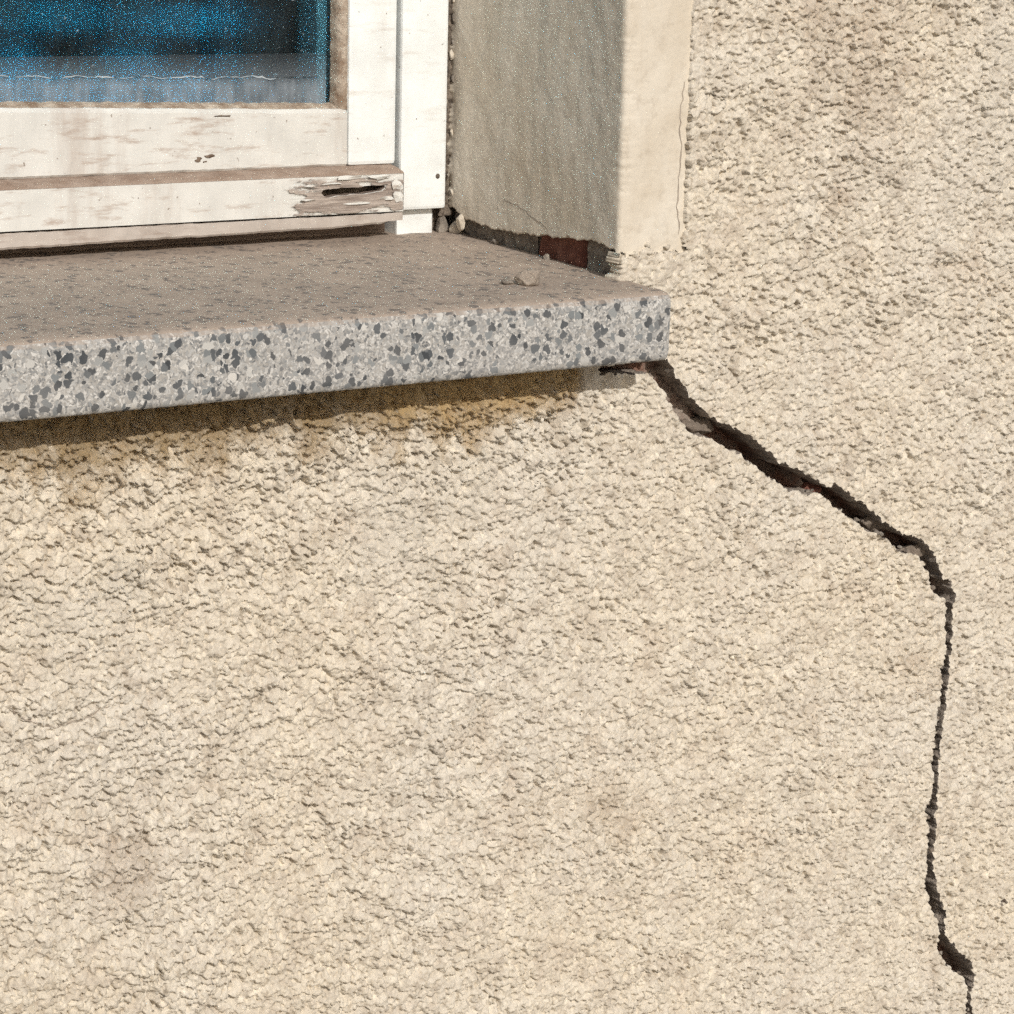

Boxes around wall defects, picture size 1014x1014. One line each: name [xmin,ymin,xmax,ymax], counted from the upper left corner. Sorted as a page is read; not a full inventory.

crack [598,359,976,1014]